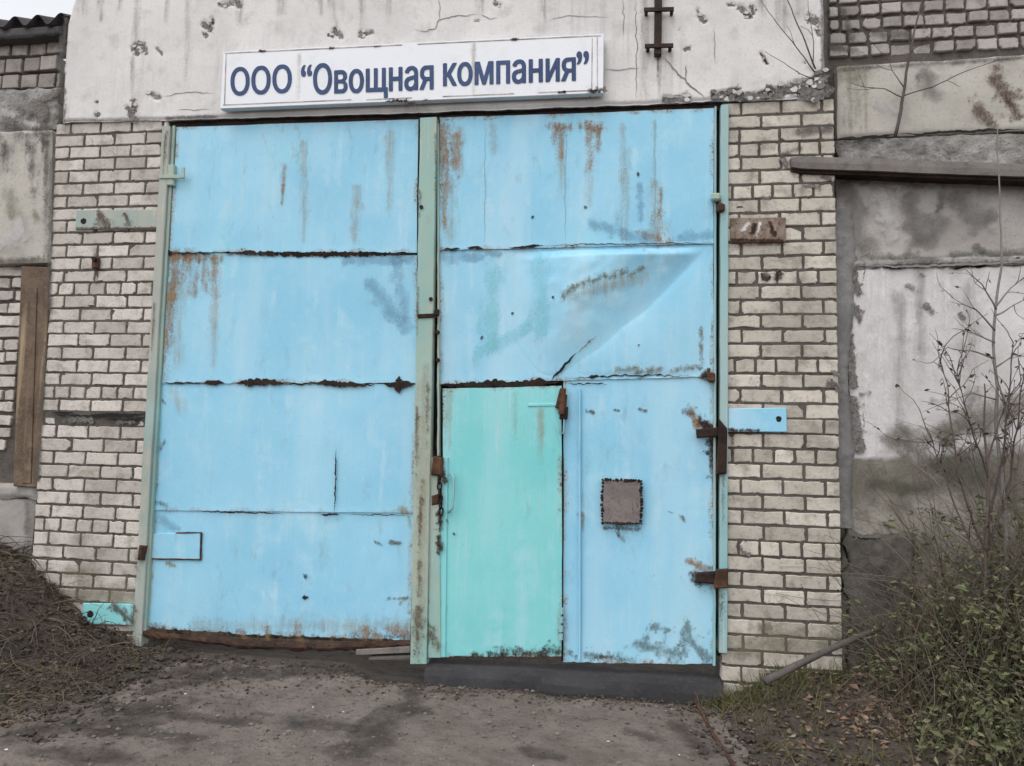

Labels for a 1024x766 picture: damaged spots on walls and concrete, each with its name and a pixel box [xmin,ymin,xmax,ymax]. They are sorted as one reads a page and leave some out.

crack [662,56,738,98]
spalling [710,62,836,103]
rust [150,385,577,664]